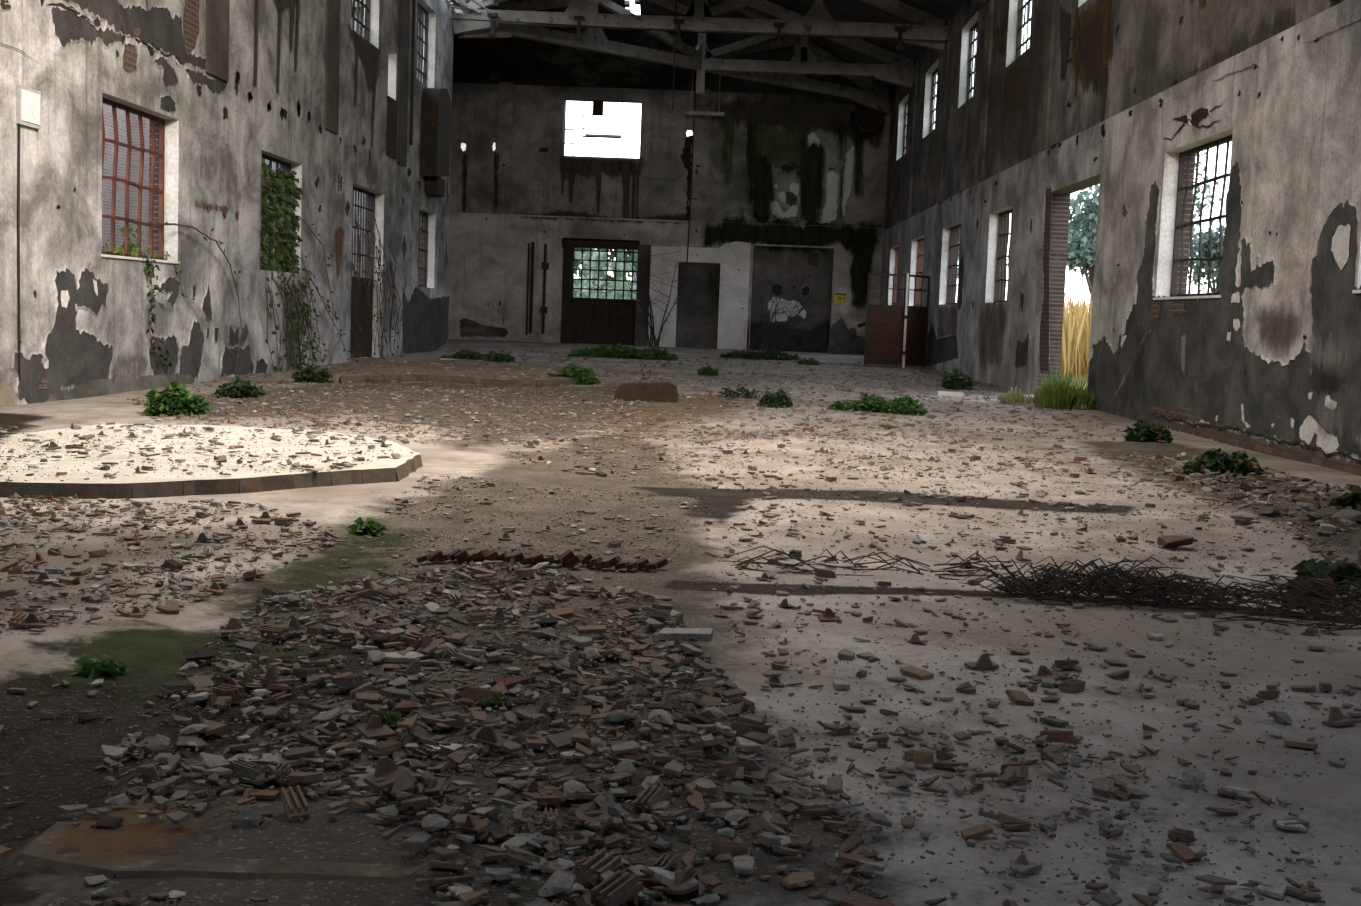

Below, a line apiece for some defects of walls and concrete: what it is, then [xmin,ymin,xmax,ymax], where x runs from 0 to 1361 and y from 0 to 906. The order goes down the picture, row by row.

flaking render [0,0,11,12]
peeling [41,0,322,134]
peeling [11,266,113,404]
peeling [1086,160,1361,476]